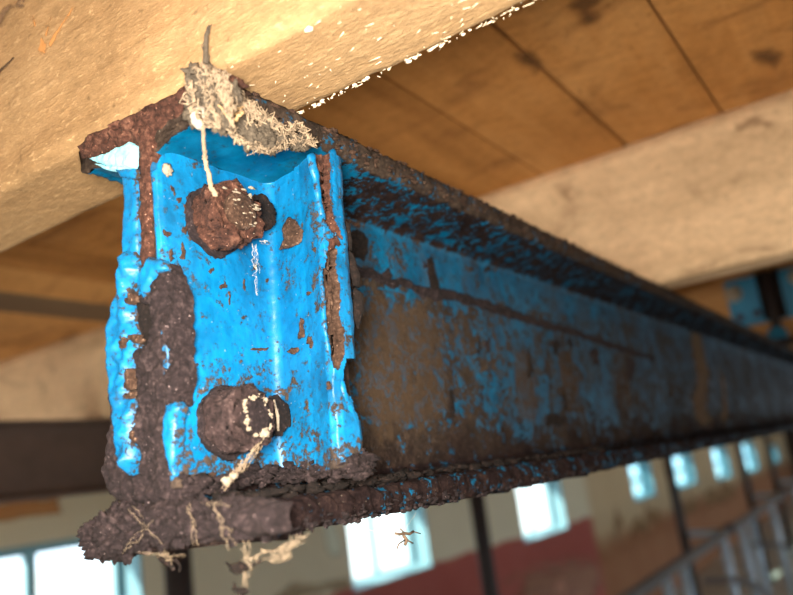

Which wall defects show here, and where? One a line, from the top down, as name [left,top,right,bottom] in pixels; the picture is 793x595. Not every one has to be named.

corrosion [218,69,250,89]
corrosion [77,85,187,180]
corrosion [162,225,188,262]
spalling [345,219,368,261]
spalling [319,248,347,370]
peeling [101,257,197,504]
corrosion [178,447,381,499]